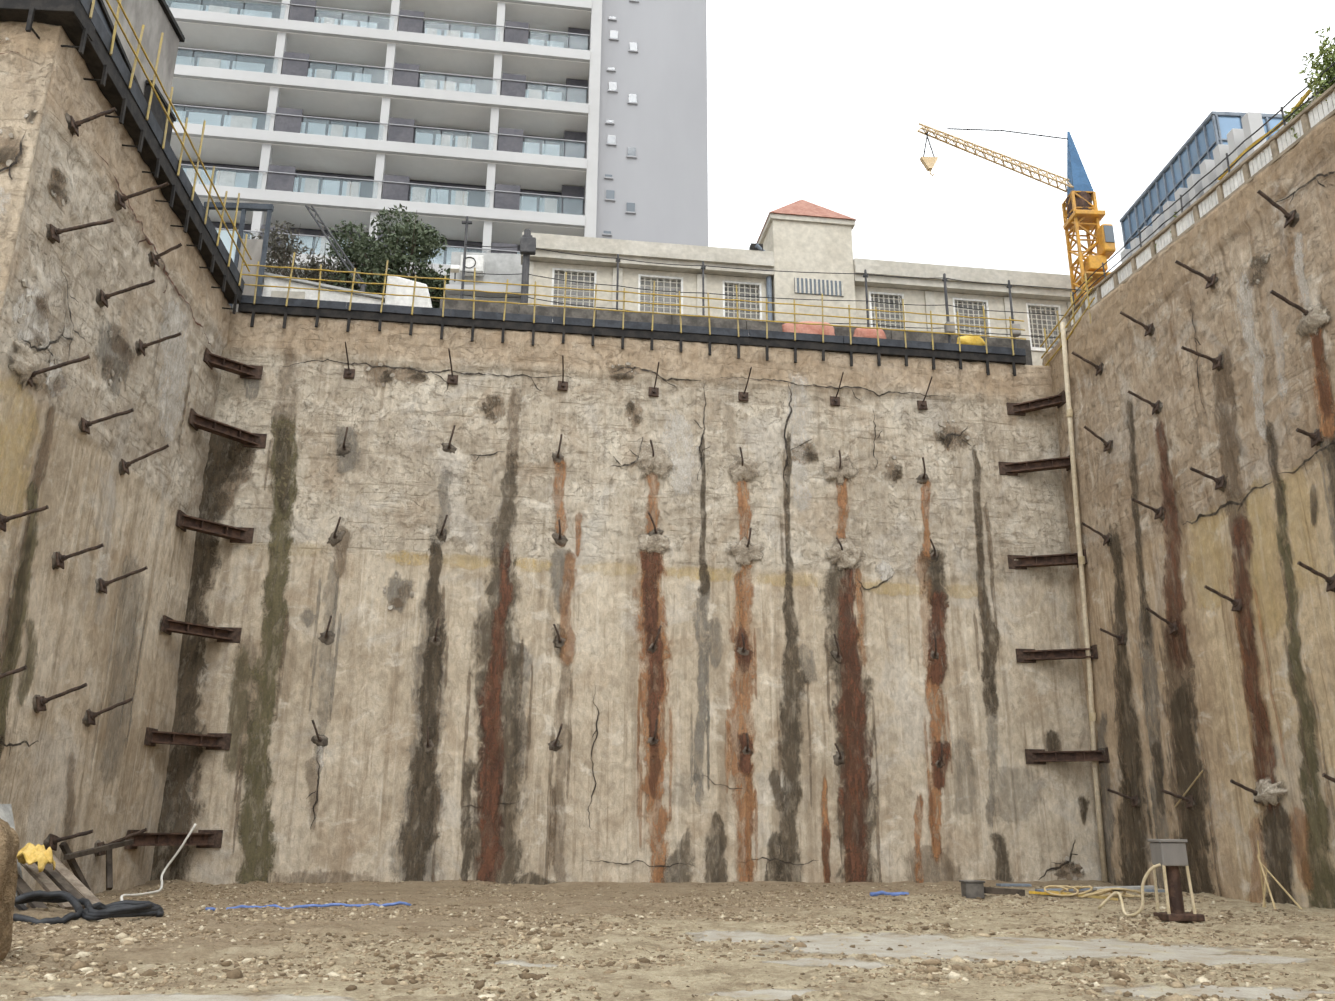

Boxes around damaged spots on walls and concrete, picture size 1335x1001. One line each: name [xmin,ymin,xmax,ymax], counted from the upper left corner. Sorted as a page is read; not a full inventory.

crack [283,359,571,393]
water stain [150,433,254,881]
water stain [228,415,314,884]
water stain [399,543,448,881]
corrosion [460,389,533,885]
corrosion [634,551,672,883]
corrosion [725,563,758,882]
water stain [765,433,812,882]
corrosion [820,563,882,883]
corrosion [914,480,952,883]
water stain [972,449,1000,715]
corrosion [1154,421,1222,896]